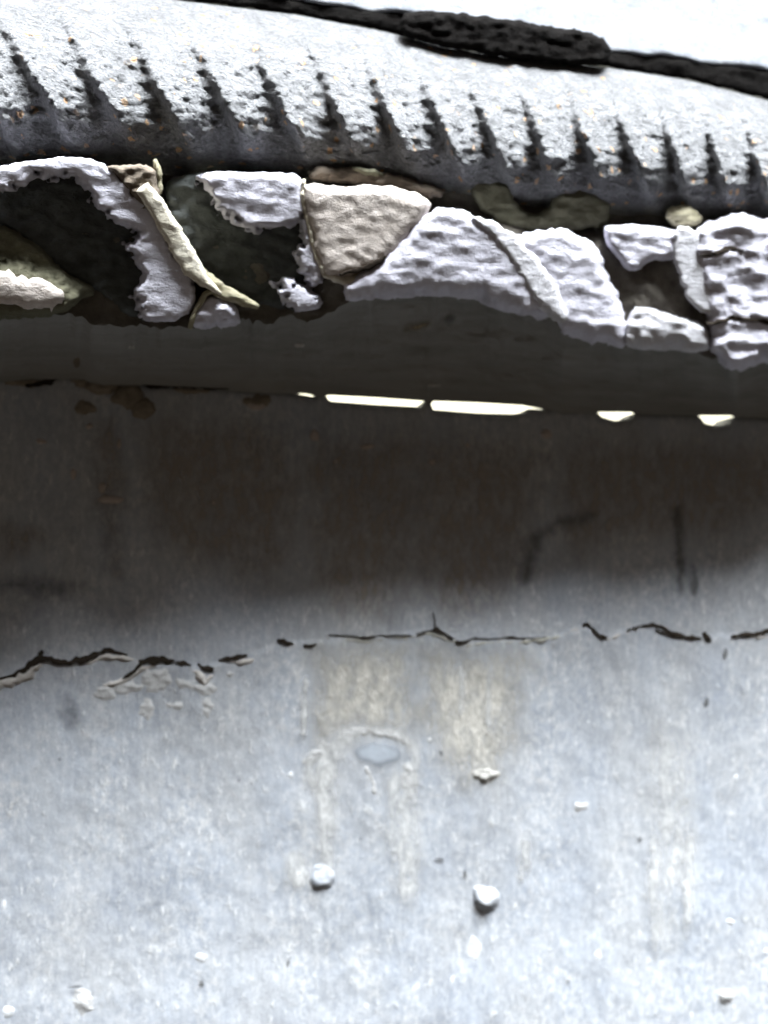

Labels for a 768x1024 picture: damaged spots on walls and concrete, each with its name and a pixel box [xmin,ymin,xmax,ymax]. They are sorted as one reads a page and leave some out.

crack [0,647,254,690]
damp [301,651,411,735]
damp [429,655,515,771]
crack [277,613,768,648]
damp [388,775,419,898]
damp [649,742,694,922]